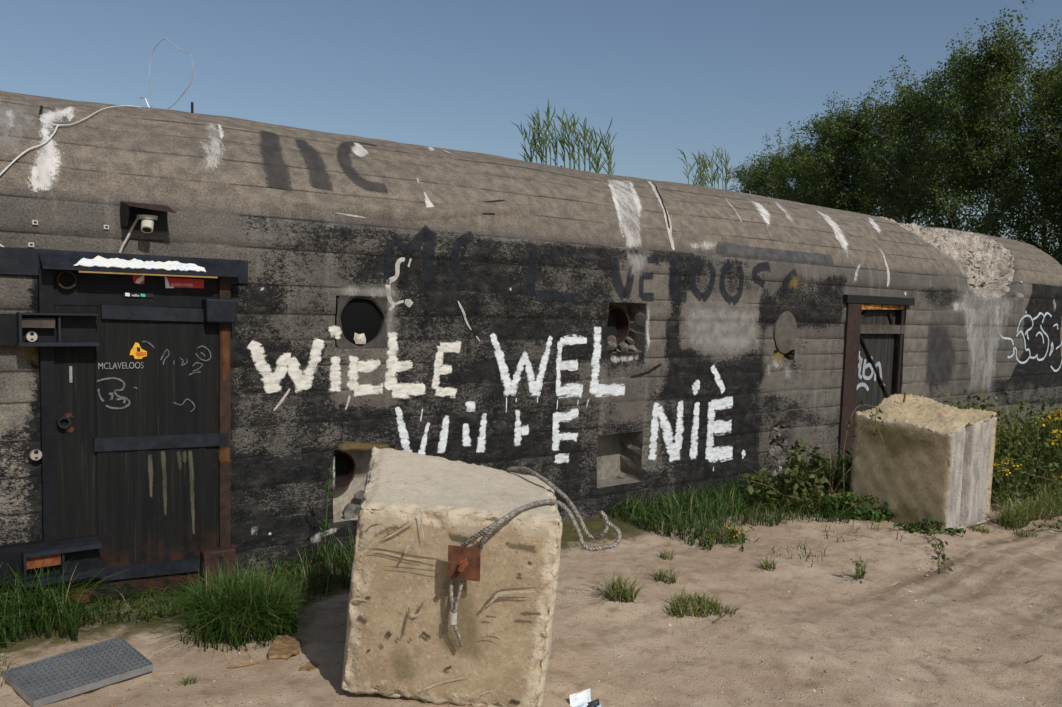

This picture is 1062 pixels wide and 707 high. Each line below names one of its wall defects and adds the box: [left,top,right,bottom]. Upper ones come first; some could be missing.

water stain [0,106,74,192]
efflorescence [203,124,224,168]
spalling [875,216,1023,308]
water stain [926,326,956,385]
water stain [940,292,1024,387]